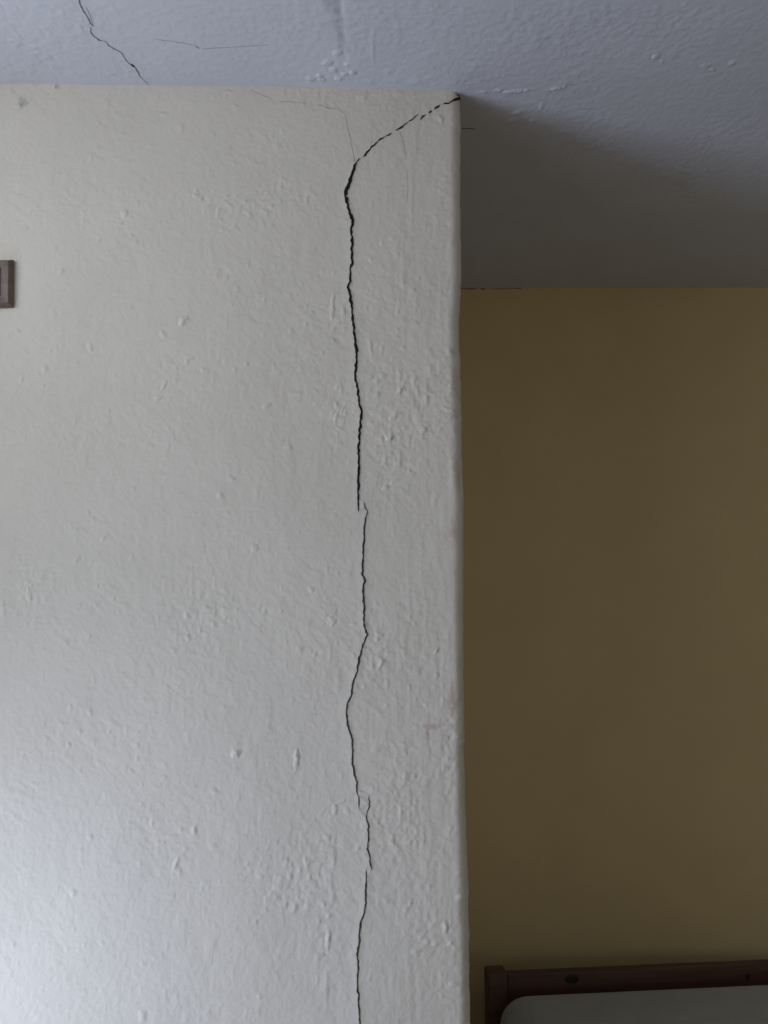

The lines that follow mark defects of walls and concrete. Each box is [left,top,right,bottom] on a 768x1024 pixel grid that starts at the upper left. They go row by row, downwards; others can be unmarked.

crack [79,0,149,85]
crack [250,89,461,1024]